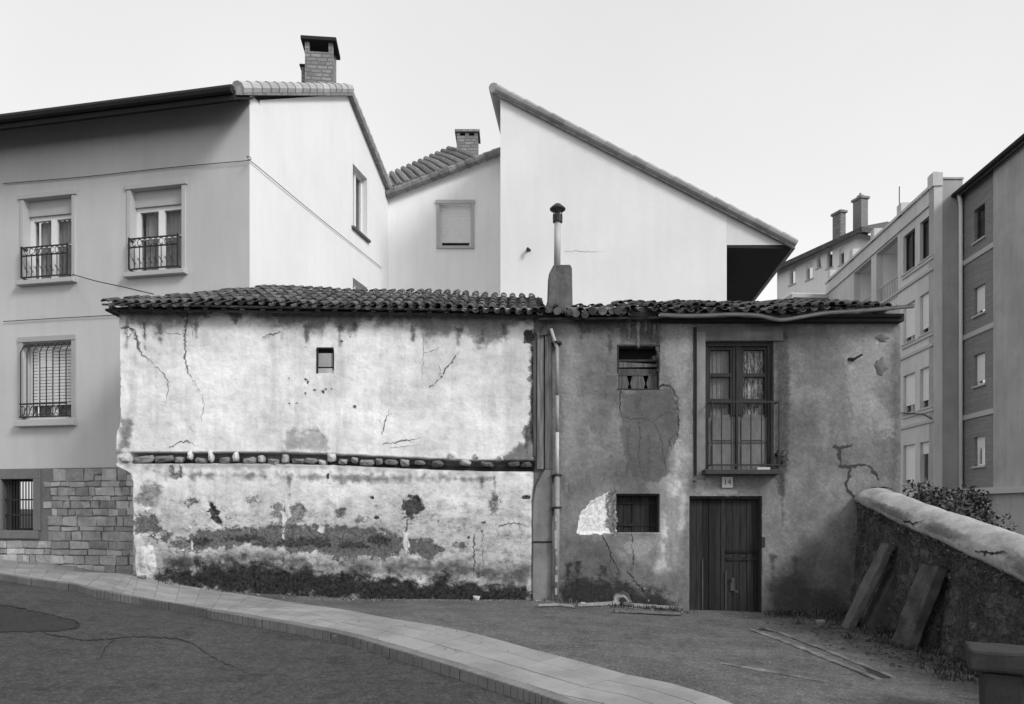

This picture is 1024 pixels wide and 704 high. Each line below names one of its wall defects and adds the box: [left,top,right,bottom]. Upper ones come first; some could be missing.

crack [121,318,205,448]
crack [422,332,460,388]
crack [379,414,420,448]
crack [833,444,893,497]
peeling [131,463,504,562]
peeling [577,491,617,535]
damp [154,554,533,600]
crack [602,535,650,602]
crack [0,604,255,676]